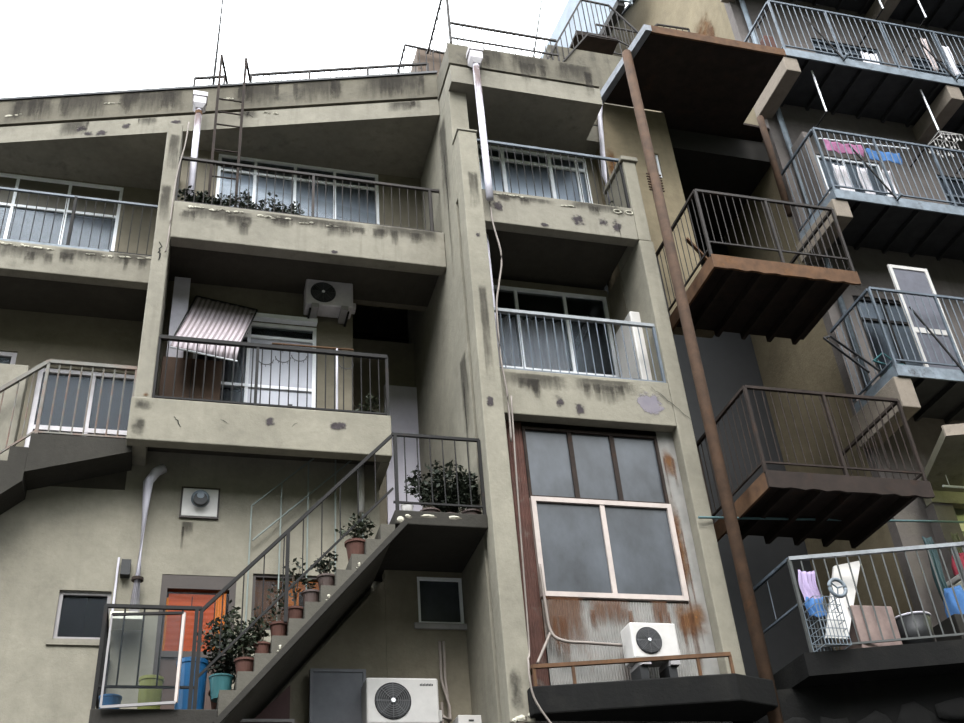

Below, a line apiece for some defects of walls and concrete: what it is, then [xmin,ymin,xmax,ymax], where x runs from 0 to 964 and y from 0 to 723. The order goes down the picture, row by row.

damp [122,91,178,104]
damp [241,84,279,97]
damp [294,81,340,93]
damp [371,76,424,90]
damp [67,121,106,135]
damp [184,208,250,228]
damp [274,215,432,238]
damp [4,245,99,258]
damp [517,374,556,389]
damp [583,379,627,396]
corrosion [546,597,633,654]